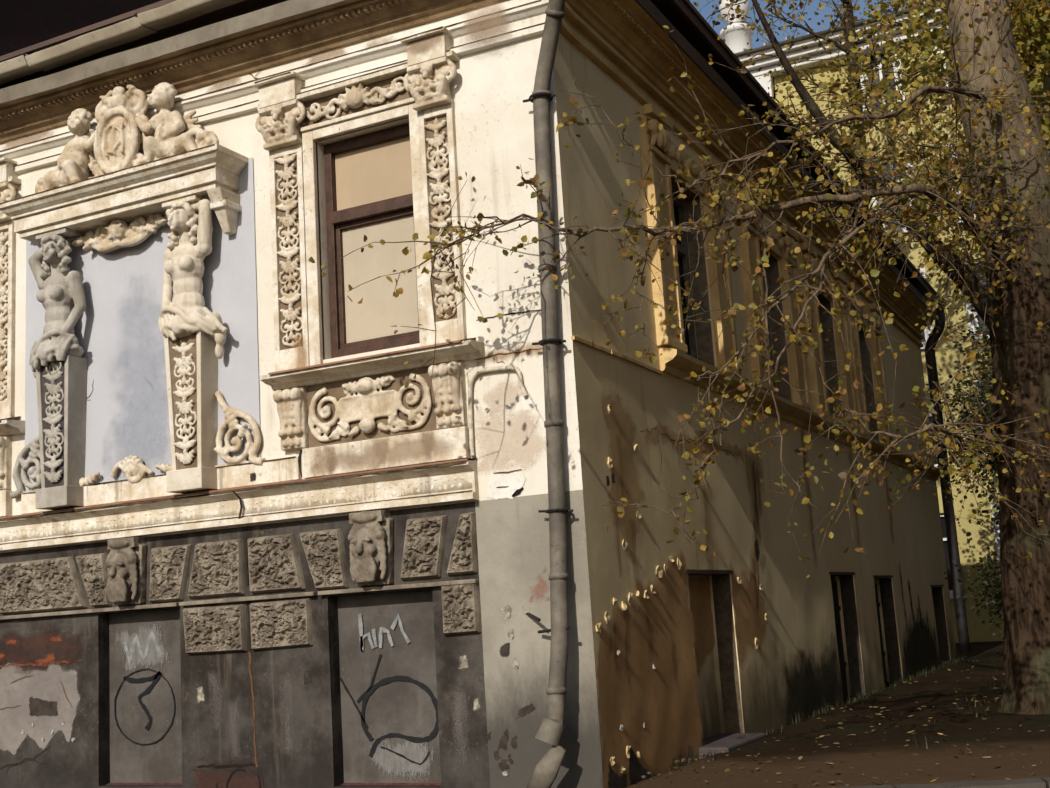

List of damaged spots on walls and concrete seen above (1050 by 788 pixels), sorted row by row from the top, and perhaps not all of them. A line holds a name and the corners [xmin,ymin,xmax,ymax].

flaking render [732,569,768,659]
flaking render [596,555,715,788]
damp [784,640,842,726]